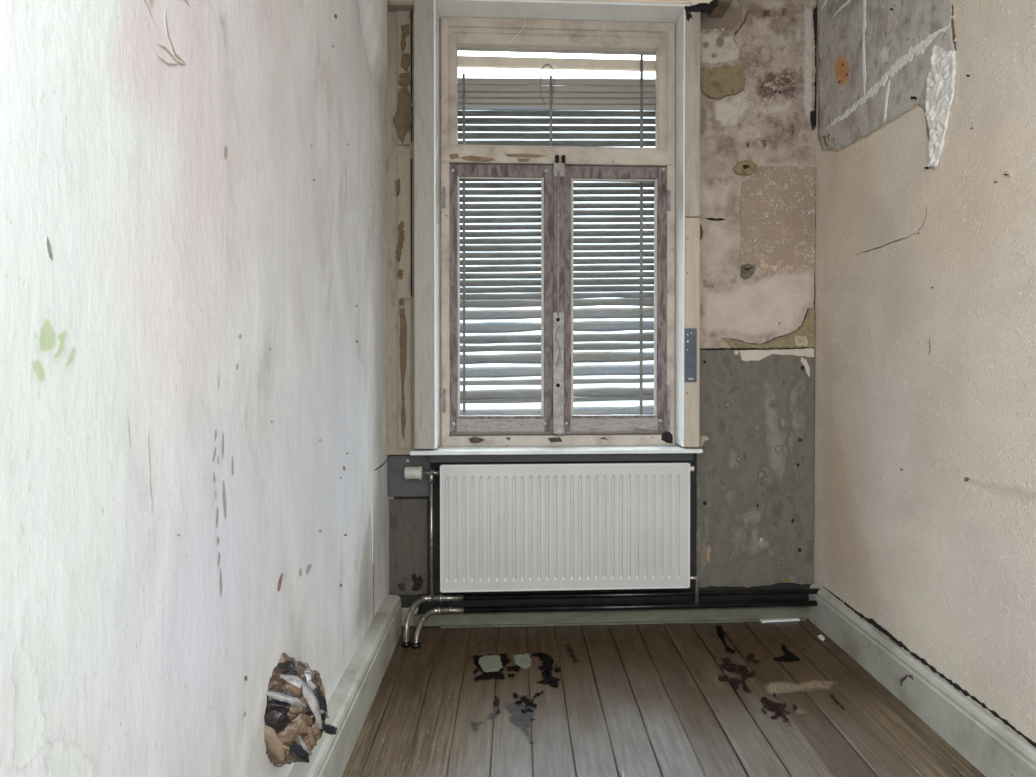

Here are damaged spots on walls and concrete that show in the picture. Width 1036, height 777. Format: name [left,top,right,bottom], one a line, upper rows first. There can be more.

spalling [700,5,751,138]
spalling [733,160,758,176]
damp [700,36,802,194]
damp [744,3,802,33]
flaking render [801,0,964,169]
peeling [701,264,815,377]